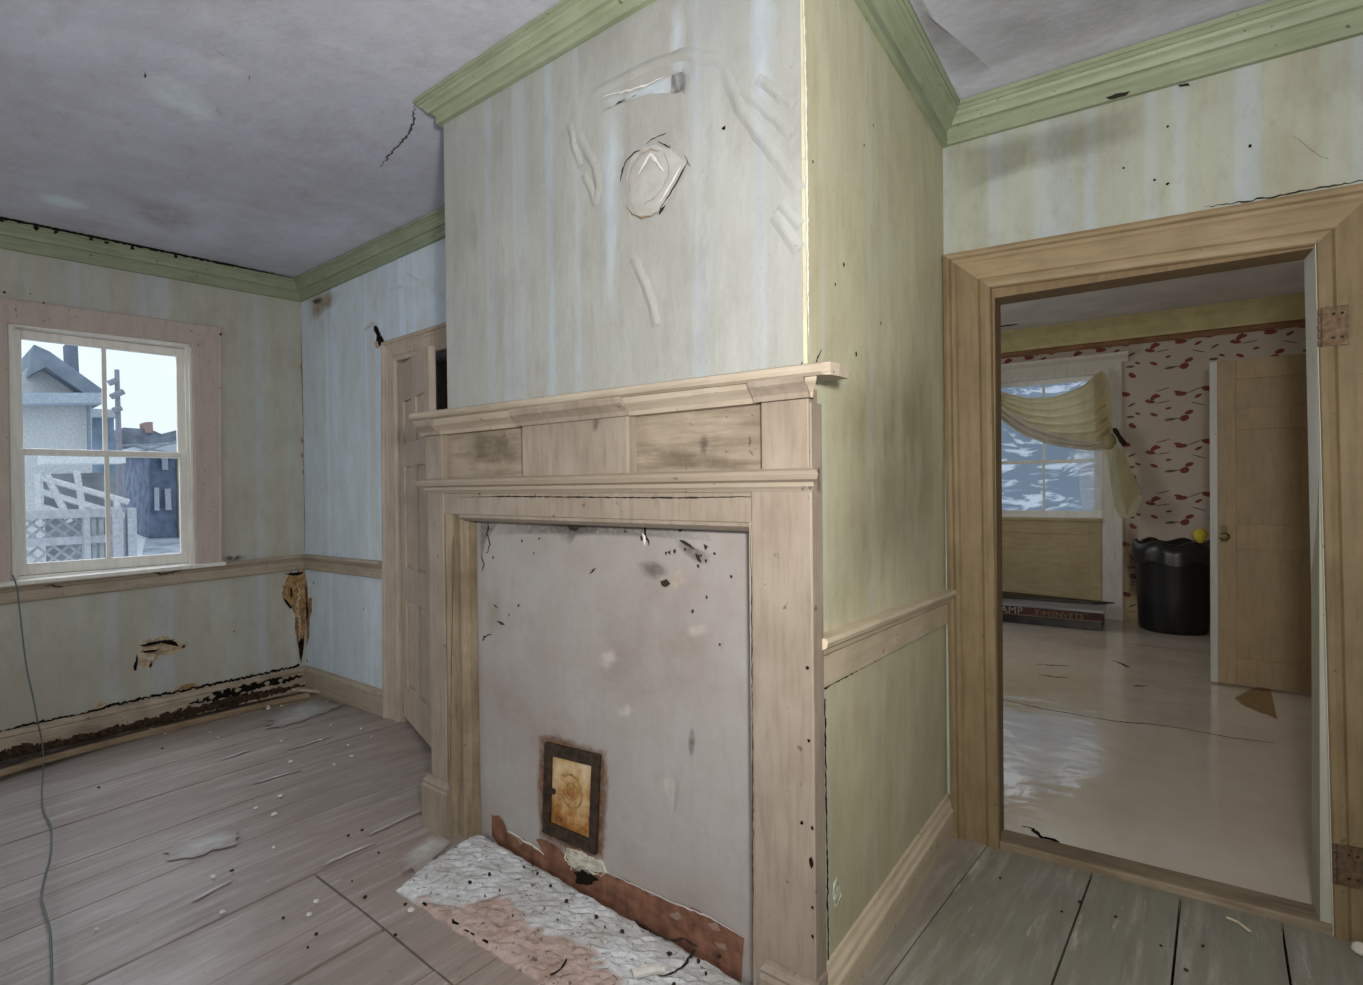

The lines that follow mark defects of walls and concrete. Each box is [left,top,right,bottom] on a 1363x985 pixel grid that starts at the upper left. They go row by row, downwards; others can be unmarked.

crack [380,104,416,168]
crack [1205,137,1363,207]
spalling [281,569,314,663]
spalling [133,634,189,671]
peeling [492,815,744,983]